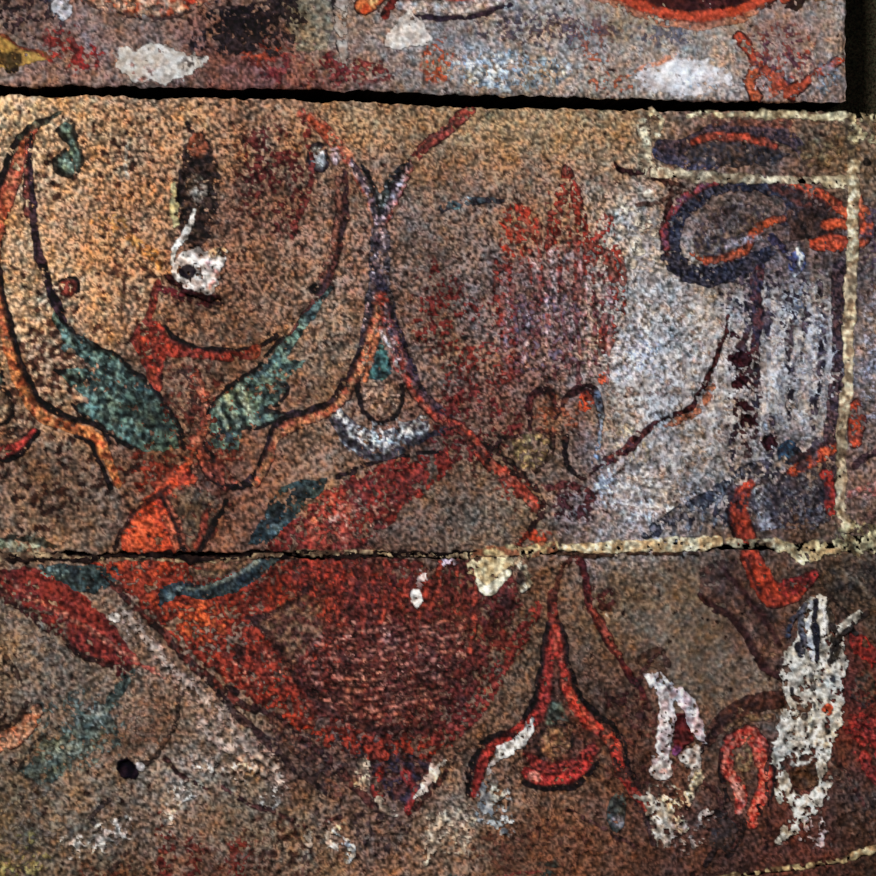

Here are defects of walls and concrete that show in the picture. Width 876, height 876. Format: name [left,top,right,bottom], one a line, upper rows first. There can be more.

crack [5,548,477,565]
crack [556,551,699,559]
peeling [108,609,290,808]
peeling [159,780,199,826]
peeling [57,815,132,860]